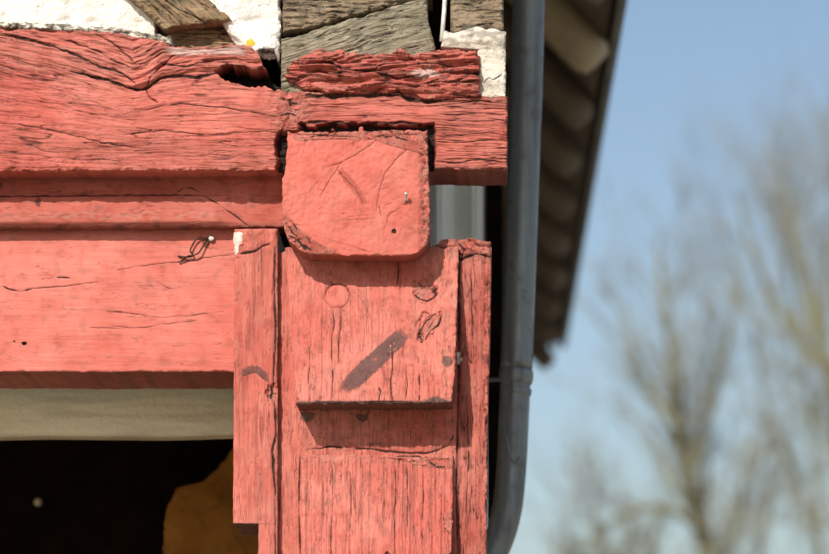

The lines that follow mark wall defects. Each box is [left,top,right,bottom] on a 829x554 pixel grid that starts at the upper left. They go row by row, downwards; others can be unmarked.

crack [1,35,505,219]
crack [0,187,250,227]
crack [2,277,81,292]
crack [115,244,277,496]
crack [309,412,469,554]